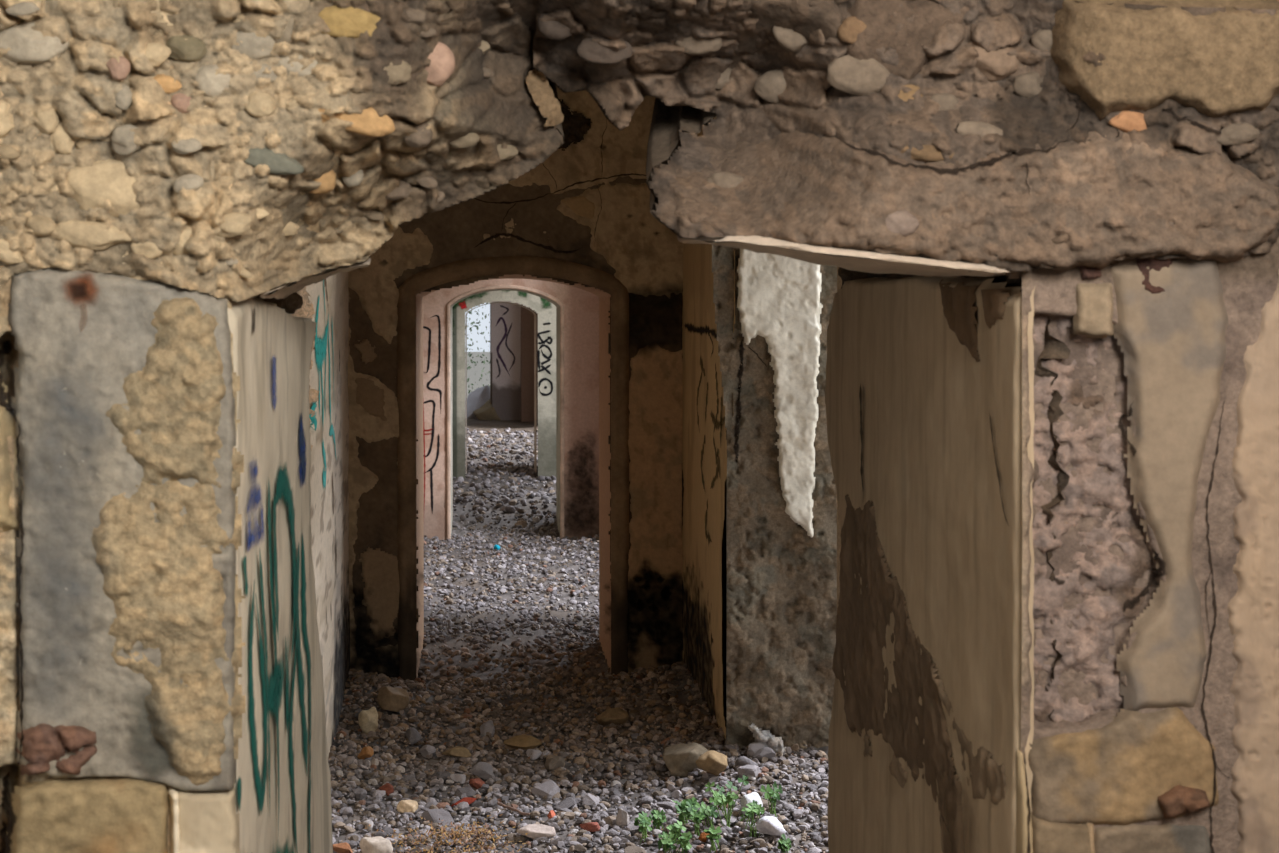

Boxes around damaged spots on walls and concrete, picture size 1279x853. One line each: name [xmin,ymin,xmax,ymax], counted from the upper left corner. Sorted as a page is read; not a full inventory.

crack [474,119,646,253]
spalling [0,0,1279,302]
corrosion [67,276,96,309]
flaking render [339,287,398,421]
flaking render [939,279,1010,362]
crack [0,340,24,853]
spalling [16,723,97,775]
spalling [91,297,246,786]
flaking render [352,436,400,647]
damp [627,561,716,720]
flaking render [832,494,1007,853]
spalling [1032,315,1153,723]